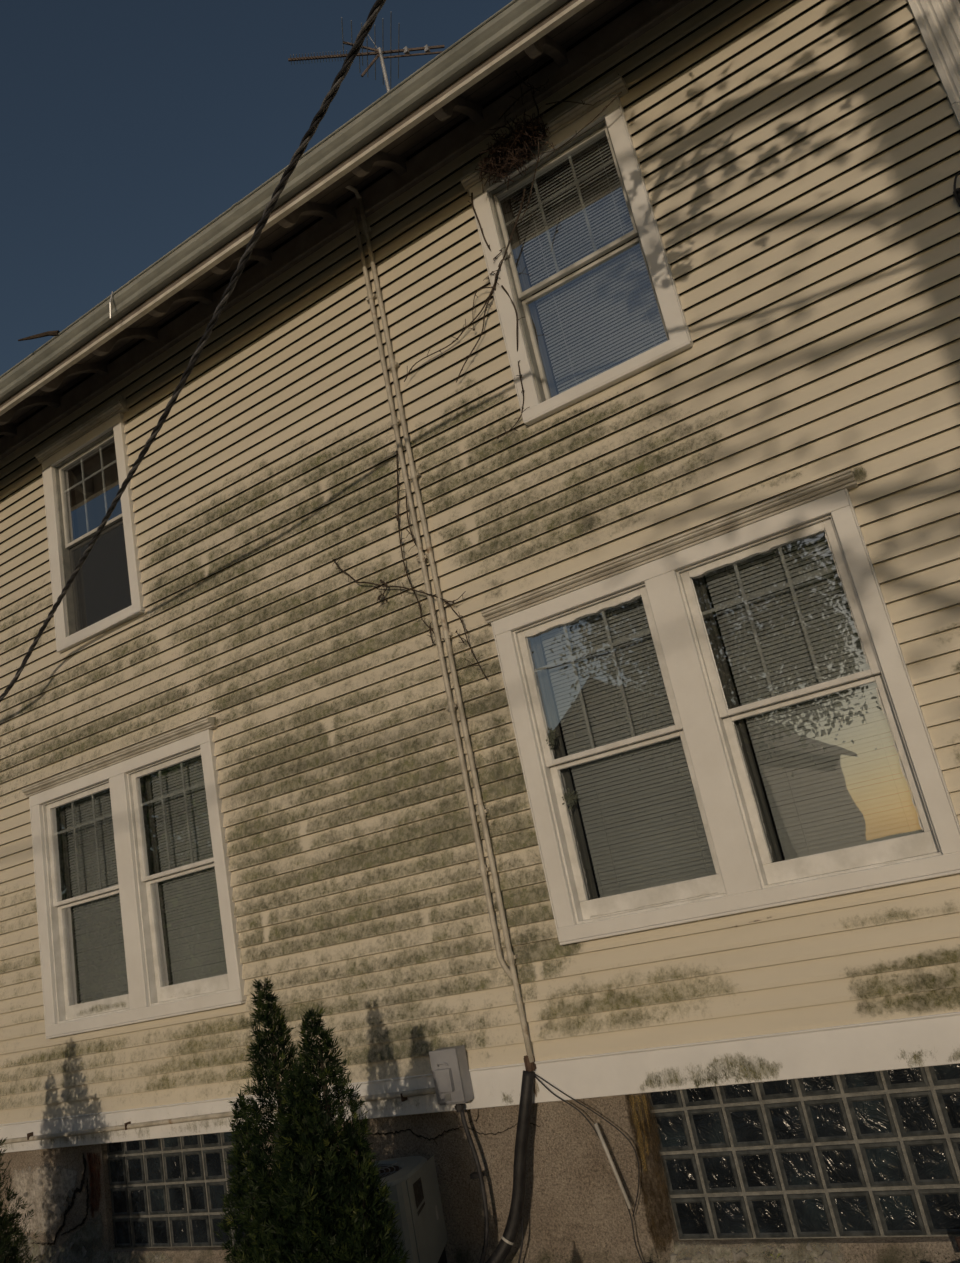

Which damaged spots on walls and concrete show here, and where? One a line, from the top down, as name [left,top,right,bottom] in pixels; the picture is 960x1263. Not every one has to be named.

leakage [404,381,716,563]
leakage [0,433,581,1095]
leakage [542,971,728,1031]
leakage [852,950,960,1013]
crack [13,1153,89,1245]
crack [363,1110,540,1145]
leakage [626,1056,778,1251]